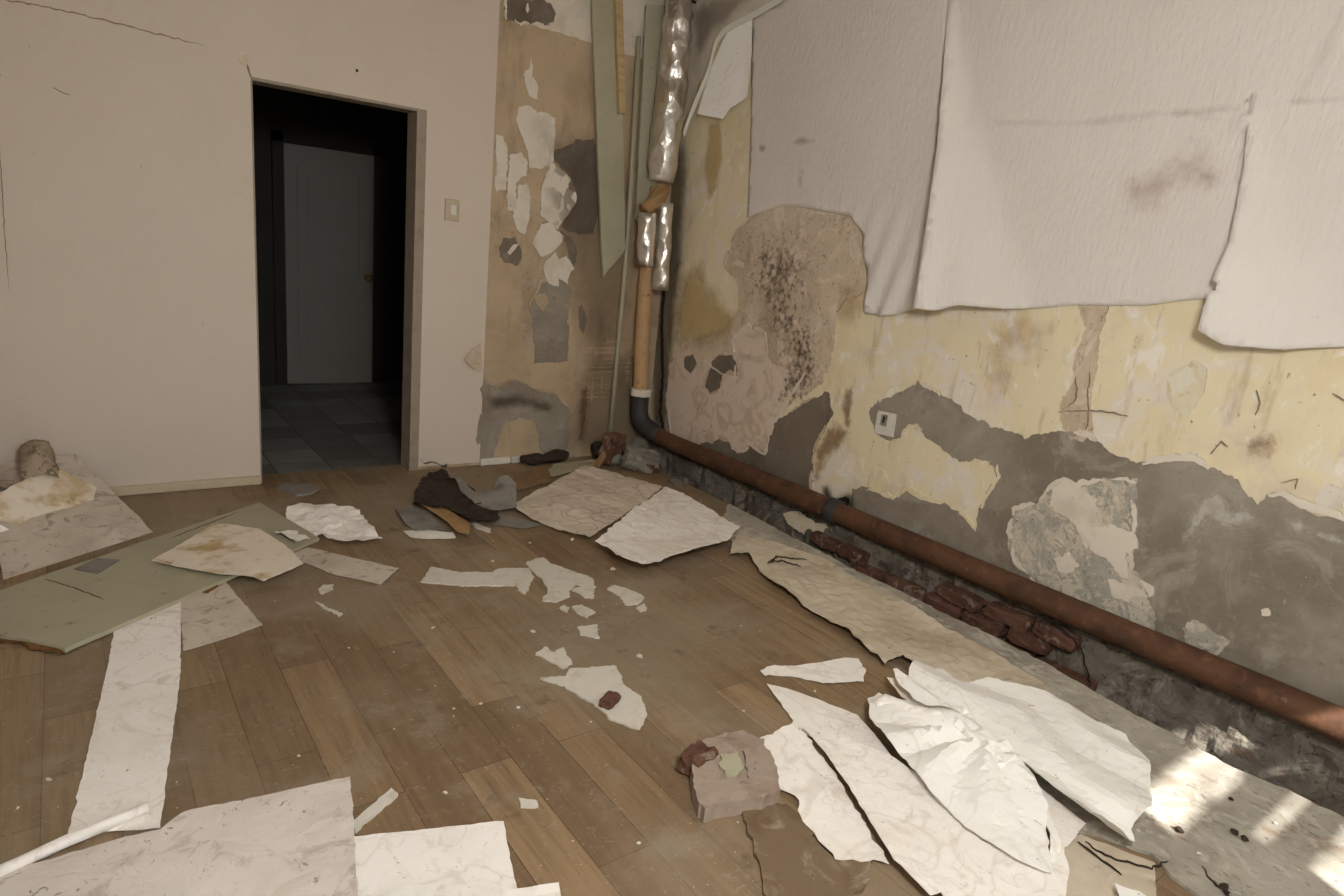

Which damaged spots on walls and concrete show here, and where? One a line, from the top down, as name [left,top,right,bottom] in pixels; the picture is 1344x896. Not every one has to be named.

crack [7,0,204,46]
peeling [503,0,592,43]
peeling [623,0,666,58]
peeling [691,0,772,85]
crack [0,160,9,286]
peeling [494,59,599,364]
leakage [756,252,811,399]
spalling [476,378,572,459]
peeling [665,323,834,491]
spalling [851,304,1344,707]
spalling [783,511,1099,692]